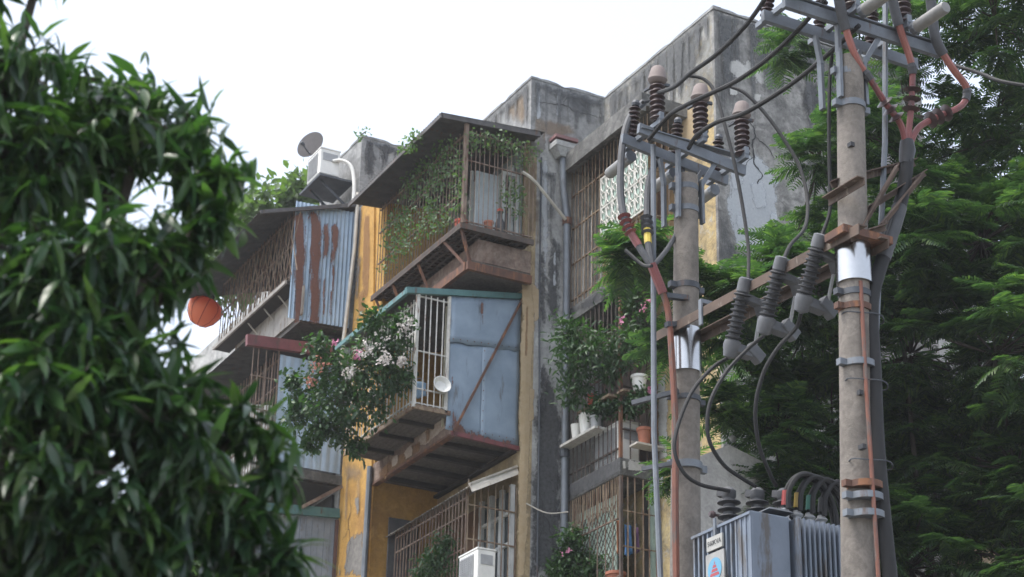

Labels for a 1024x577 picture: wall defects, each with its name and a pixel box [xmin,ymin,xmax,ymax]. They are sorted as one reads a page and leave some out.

leakage [486,13,836,134]
corrosion [293,212,339,324]
leakage [525,155,621,327]
leakage [530,359,620,577]
flaking render [339,532,363,576]